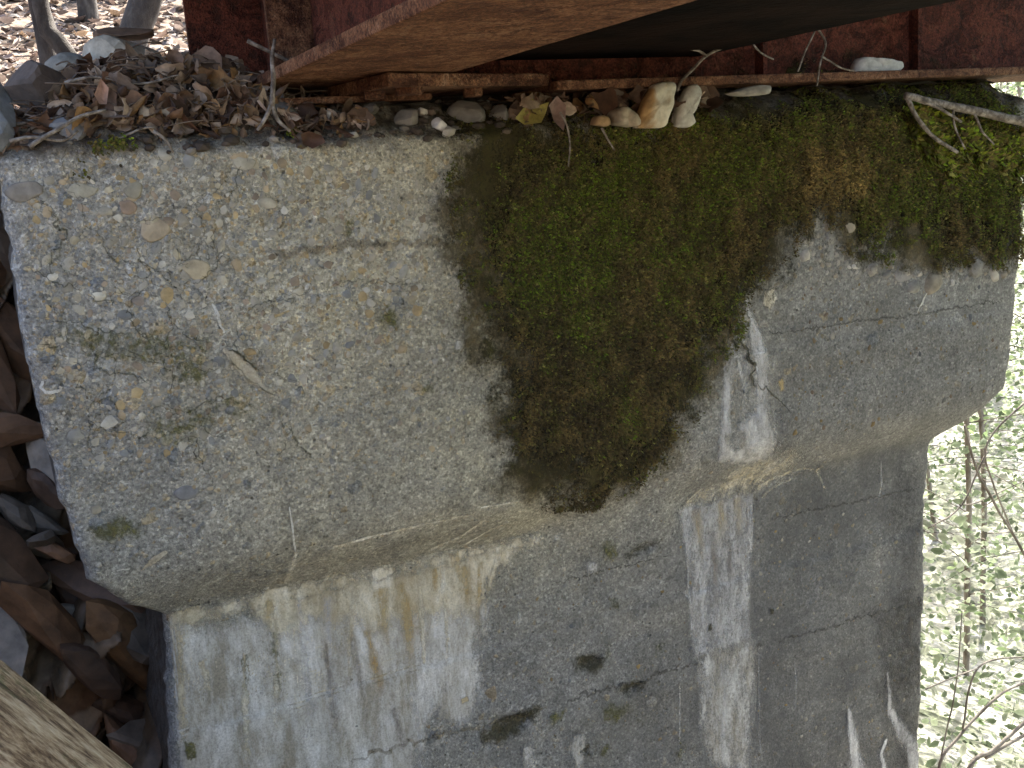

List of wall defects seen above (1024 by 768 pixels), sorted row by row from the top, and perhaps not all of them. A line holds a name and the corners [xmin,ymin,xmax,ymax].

water stain [719,298,784,483]
crack [731,340,789,411]
water stain [763,289,777,309]
water stain [169,536,540,768]
water stain [683,468,819,768]